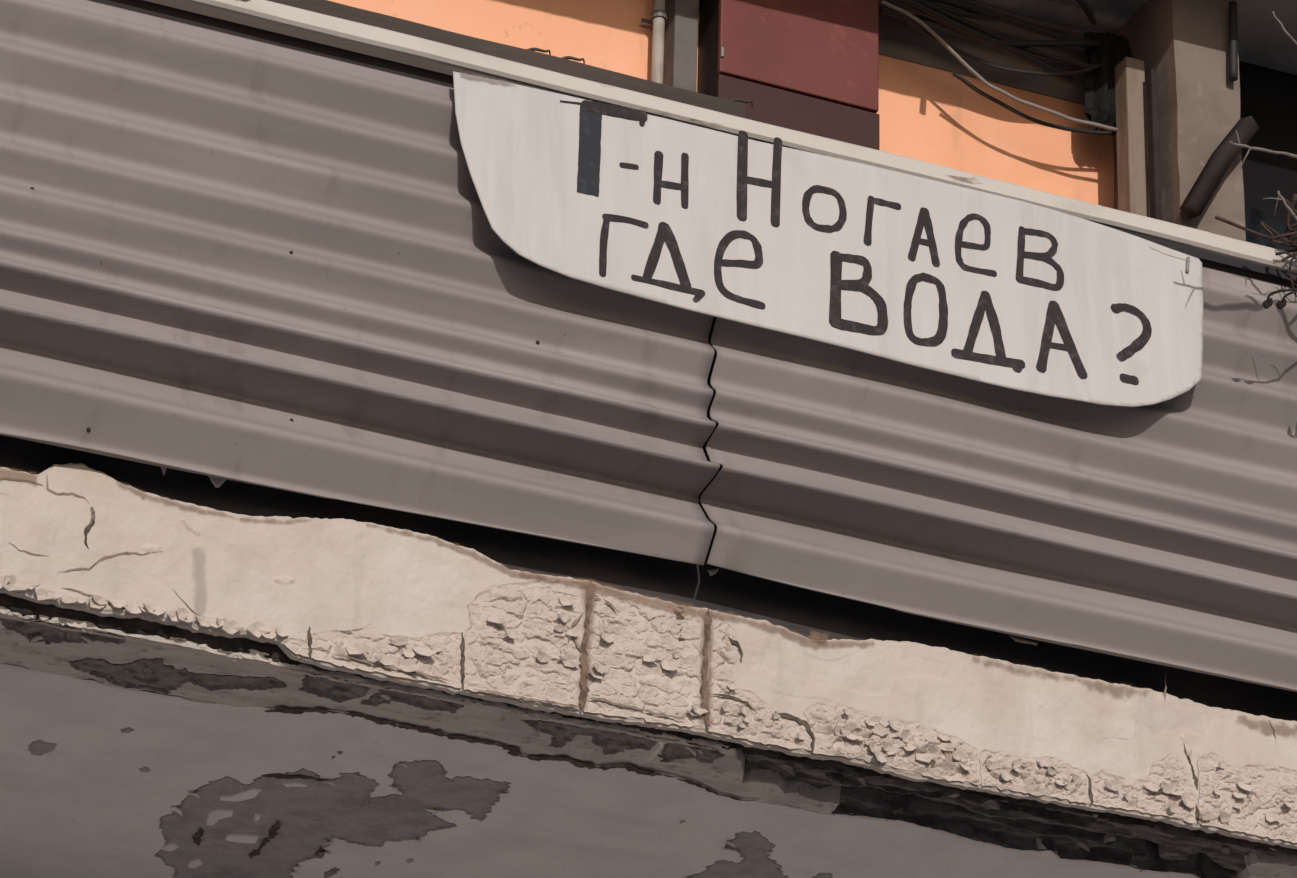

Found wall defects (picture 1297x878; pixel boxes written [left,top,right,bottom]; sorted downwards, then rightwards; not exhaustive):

crack [0,473,162,609]
spalling [0,575,1297,878]
crack [1184,745,1200,823]